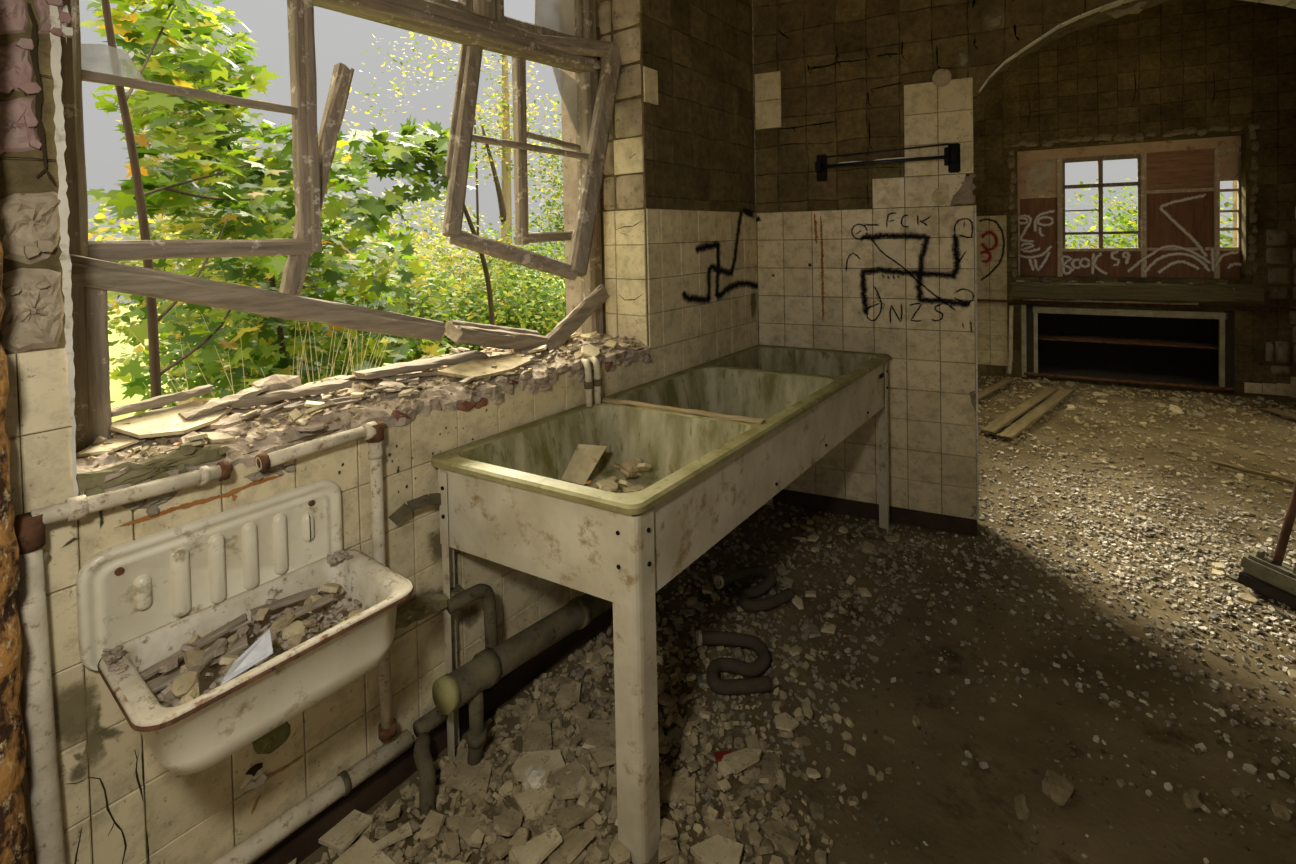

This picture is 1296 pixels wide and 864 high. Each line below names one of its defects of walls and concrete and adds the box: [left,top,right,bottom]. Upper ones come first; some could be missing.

spalling [951,174,976,205]
spalling [376,350,652,423]
flaking render [76,443,230,516]
rust [119,475,282,527]
flaking render [244,462,295,481]
crack [134,750,144,800]
crack [67,777,149,864]